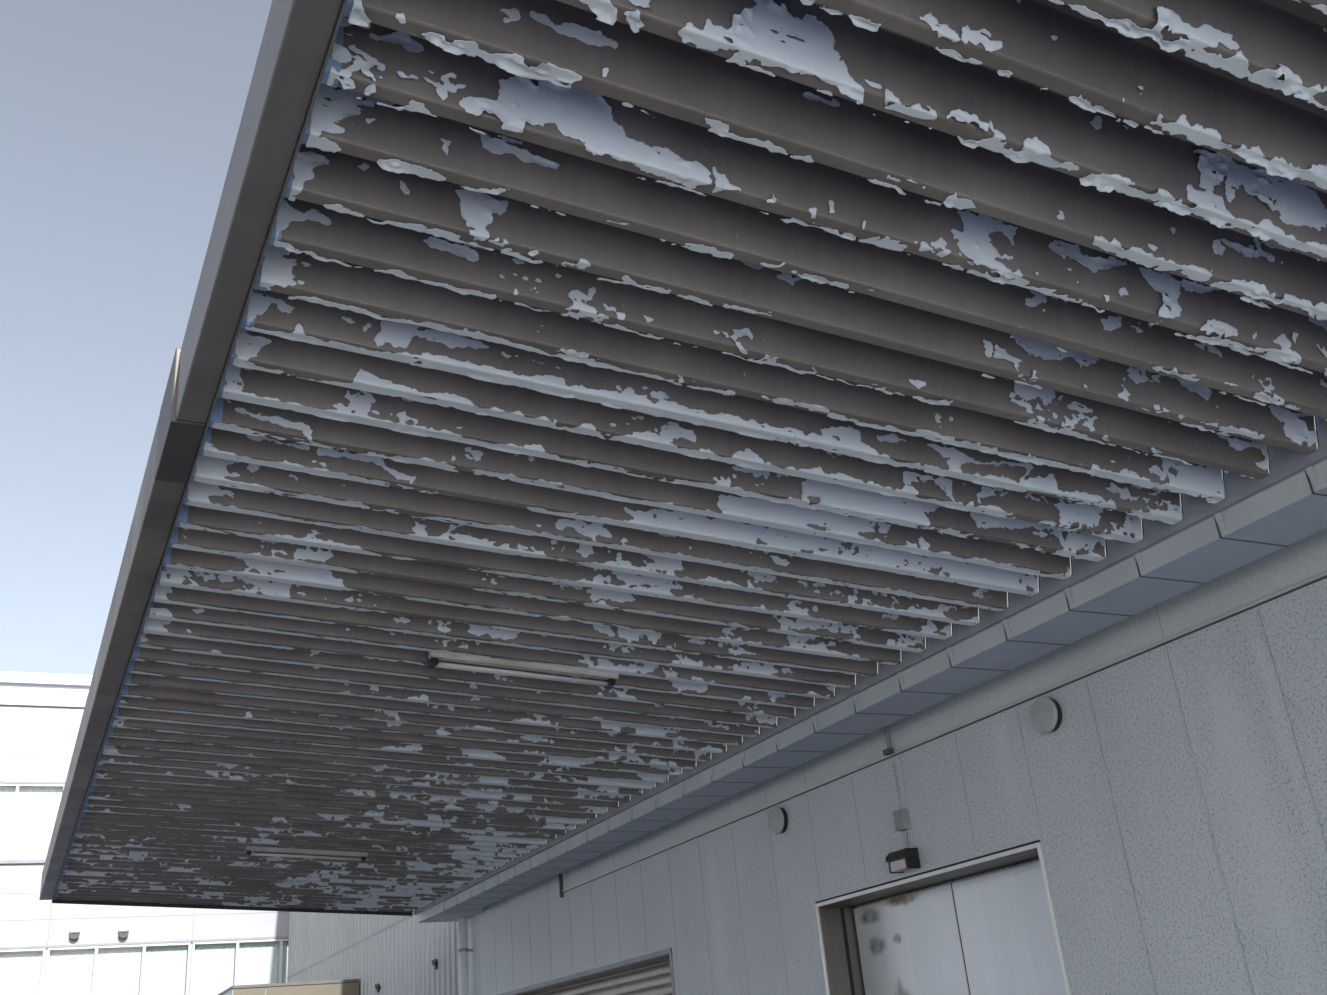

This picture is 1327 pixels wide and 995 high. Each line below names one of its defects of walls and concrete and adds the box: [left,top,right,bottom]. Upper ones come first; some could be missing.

peeling [340,0,741,196]
peeling [678,0,1327,264]
peeling [760,175,1327,387]
peeling [54,42,1228,911]
peeling [1142,404,1269,479]
peeling [1118,363,1327,447]